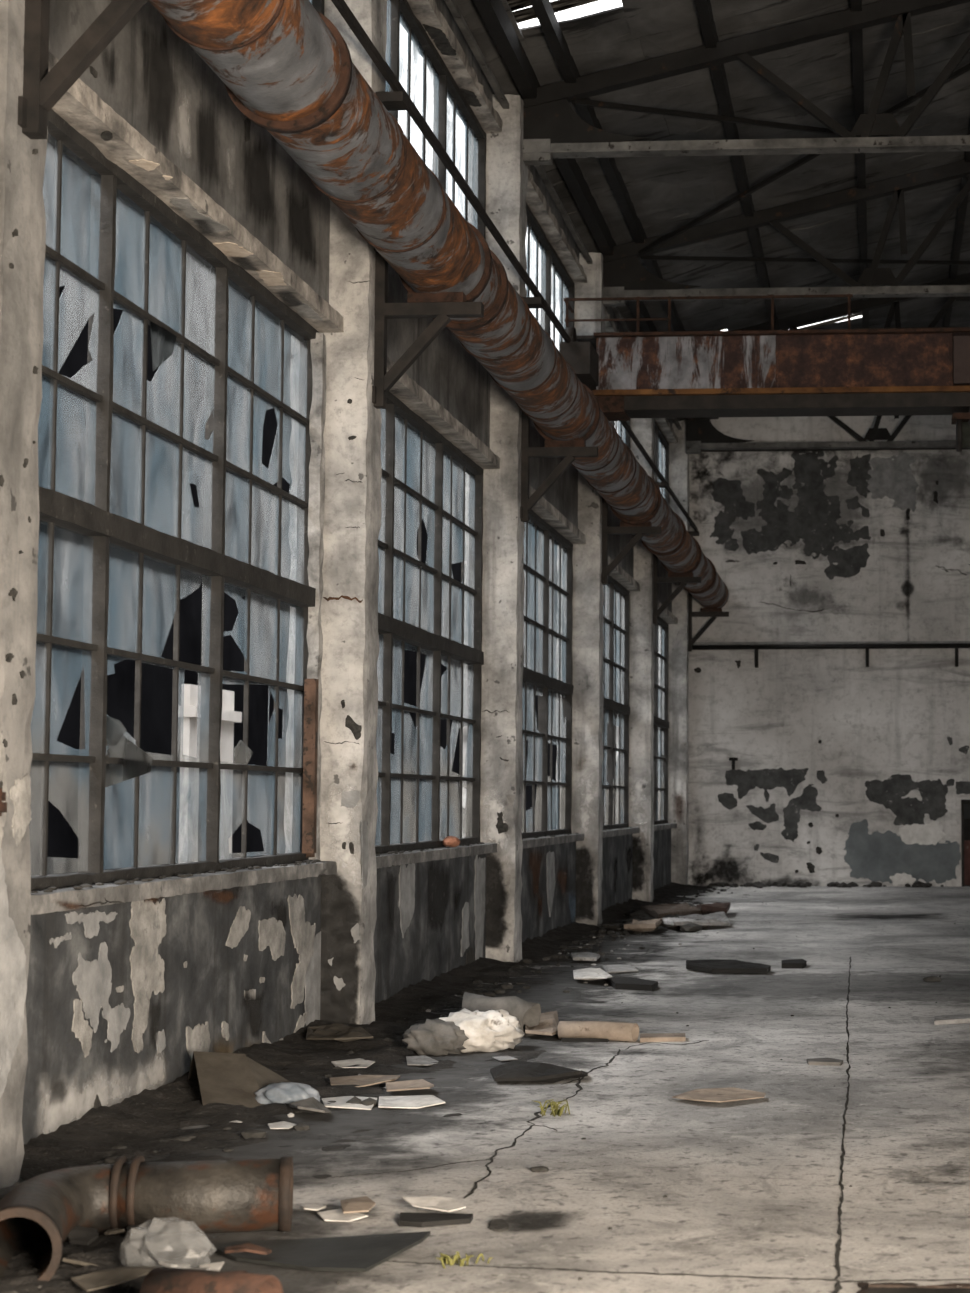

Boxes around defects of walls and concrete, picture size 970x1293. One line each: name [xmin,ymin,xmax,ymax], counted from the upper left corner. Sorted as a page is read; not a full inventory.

peeling [710,451,919,580]
peeling [0,732,32,1099]
peeling [49,898,167,1057]
peeling [226,894,346,1044]
peeling [351,923,361,943]
peeling [399,863,415,938]
peeling [461,855,486,960]
peeling [546,851,556,917]
peeling [718,768,970,886]
peeling [186,1021,230,1066]
crack [331,1040,709,1198]